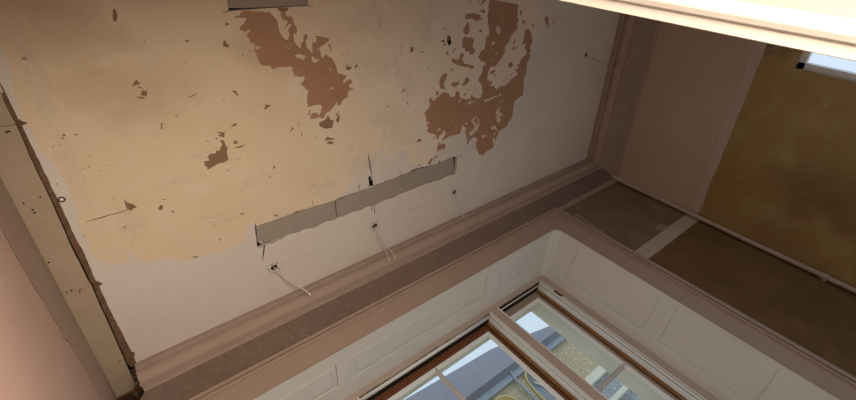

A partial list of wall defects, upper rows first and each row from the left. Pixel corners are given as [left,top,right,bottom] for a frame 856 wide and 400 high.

peeling [0,0,554,400]